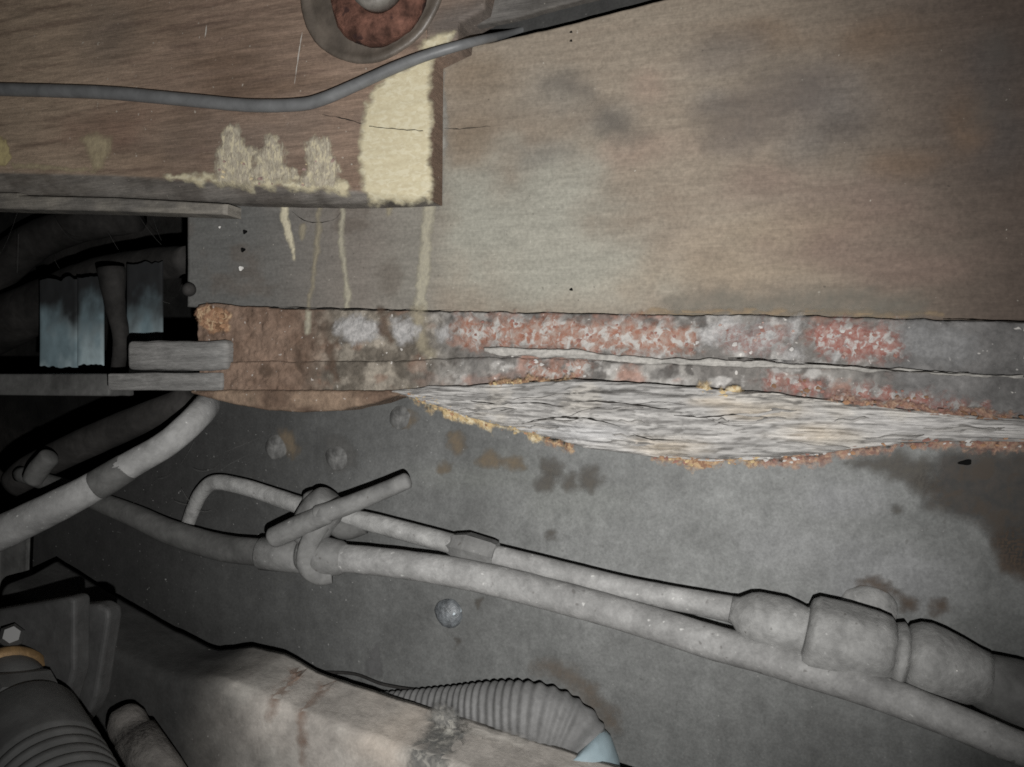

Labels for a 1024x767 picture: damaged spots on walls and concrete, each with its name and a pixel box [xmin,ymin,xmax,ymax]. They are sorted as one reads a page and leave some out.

leakage [280,207,321,334]
leakage [338,208,351,309]
leakage [414,206,435,359]
crack [472,400,768,440]
rust [699,383,741,397]
peeling [763,372,967,412]
rust [827,396,1024,420]